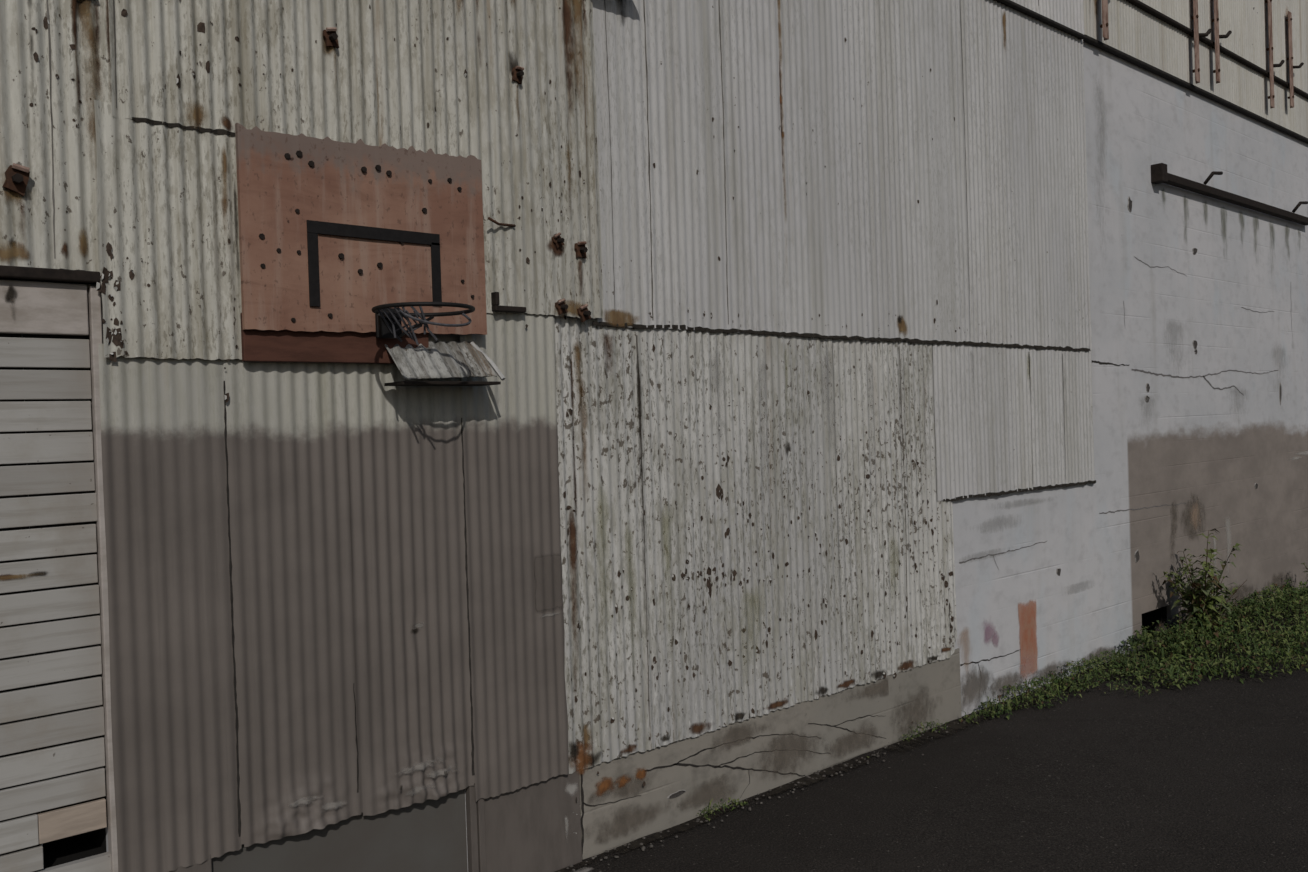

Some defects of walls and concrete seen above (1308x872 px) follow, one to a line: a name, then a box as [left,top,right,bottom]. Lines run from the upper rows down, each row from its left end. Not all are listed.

rust [563,0,586,107]
rust [548,240,564,255]
rust [604,310,634,368]
crack [1092,360,1278,396]
rust [569,346,587,632]
rust [871,647,951,679]
rust [820,679,855,695]
rust [692,723,710,733]
rust [570,725,599,773]
rust [596,769,646,795]
crack [581,715,886,855]